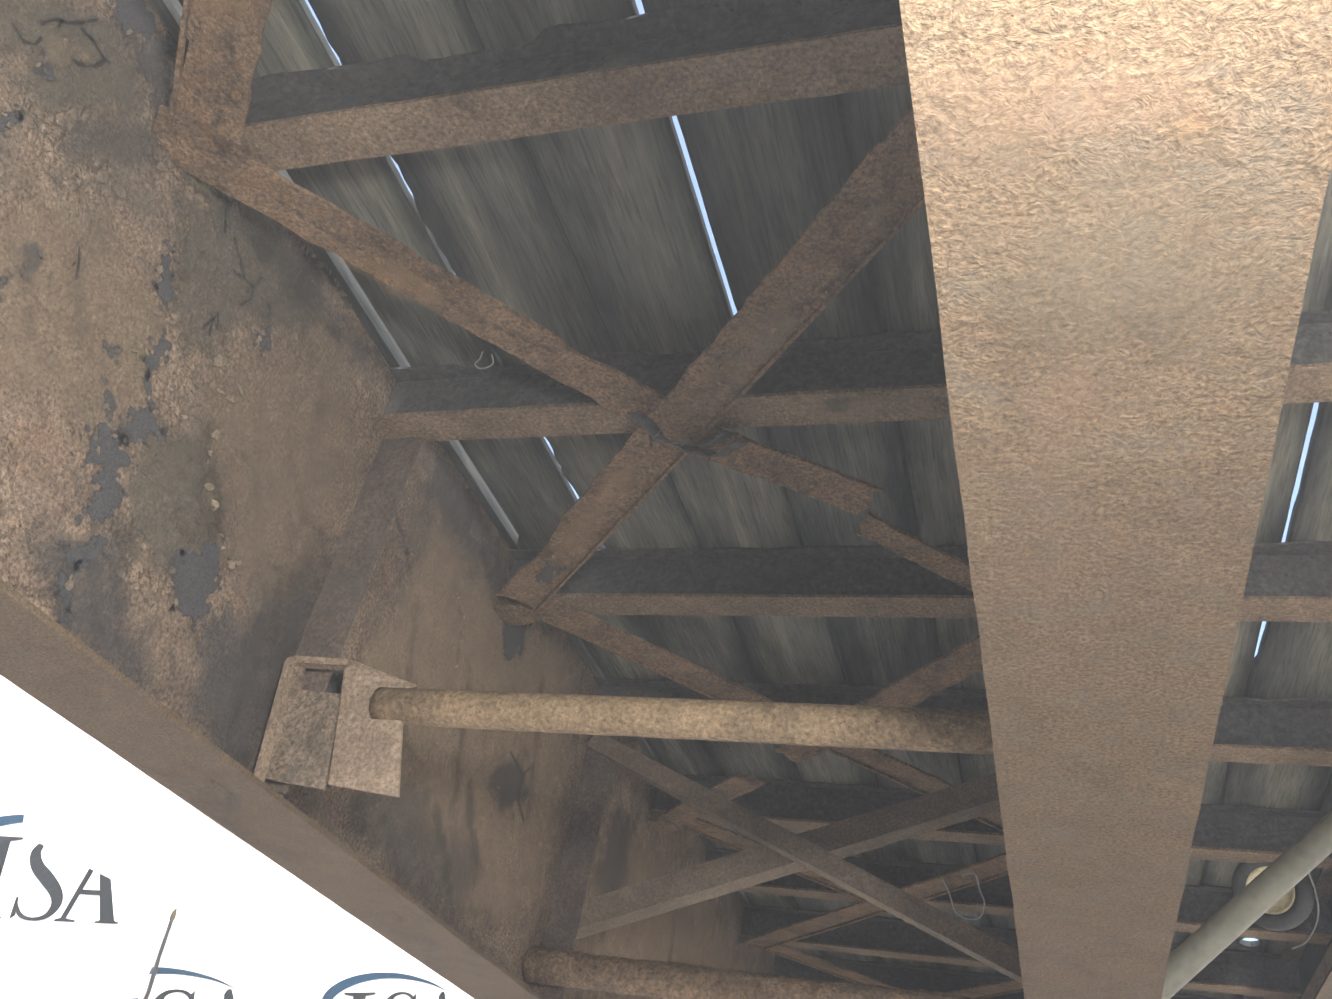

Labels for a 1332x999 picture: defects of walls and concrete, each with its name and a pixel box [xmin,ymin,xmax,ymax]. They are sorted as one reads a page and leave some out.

spalling [48,239,182,623]
peeling [204,483,219,511]
spalling [169,533,242,631]